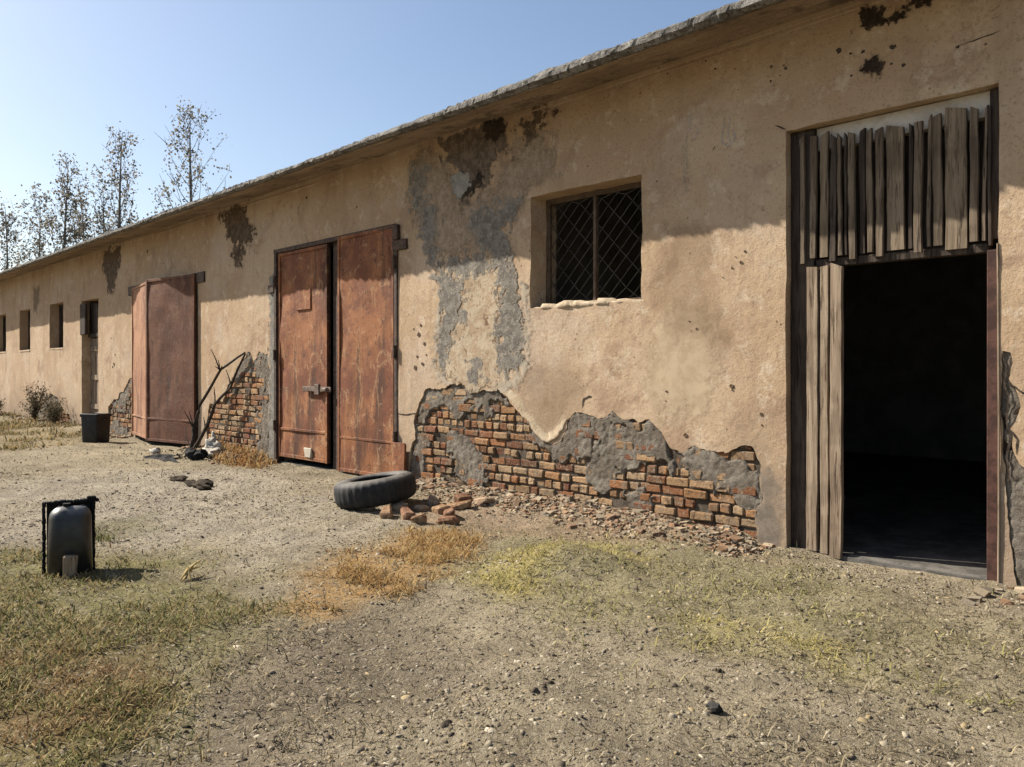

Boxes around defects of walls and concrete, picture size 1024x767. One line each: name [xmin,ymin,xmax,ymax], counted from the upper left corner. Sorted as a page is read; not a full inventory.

flaking render [835,48,905,79]
flaking render [110,378,134,436]
flaking render [208,273,274,459]
flaking render [379,117,763,539]
flaking render [997,351,1024,586]